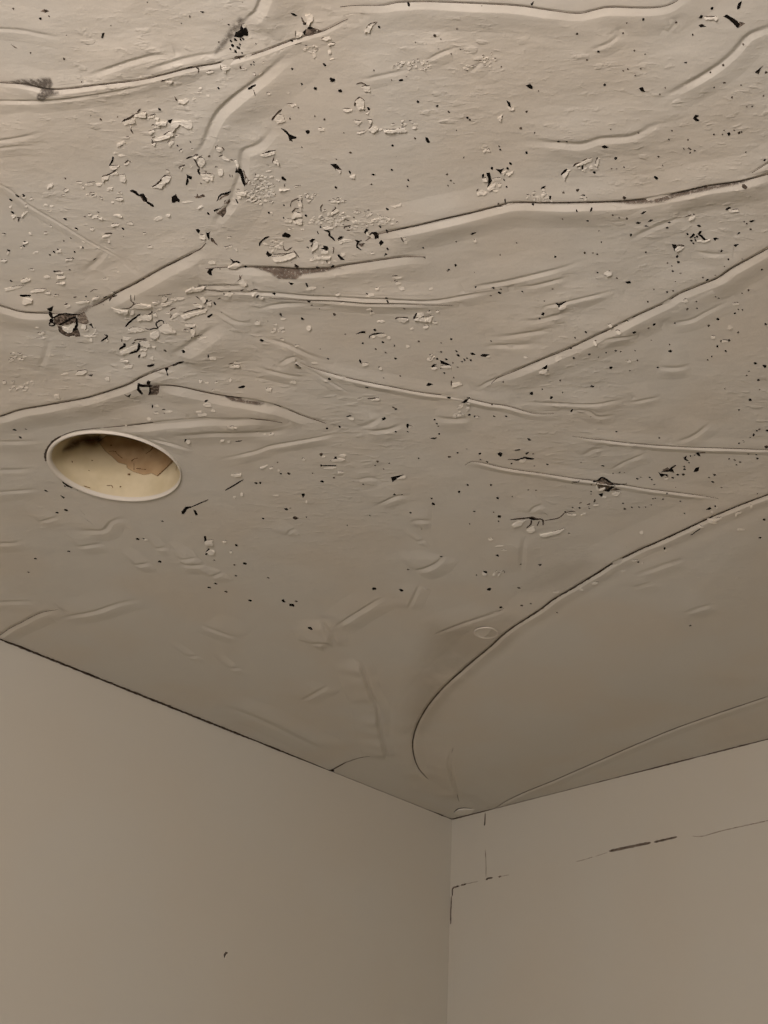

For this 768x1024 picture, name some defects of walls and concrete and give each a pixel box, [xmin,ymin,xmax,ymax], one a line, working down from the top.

peeling [272,92,297,142]
peeling [343,82,430,143]
peeling [476,162,513,209]
peeling [5,108,402,421]
crack [44,422,153,461]
crack [0,436,768,924]